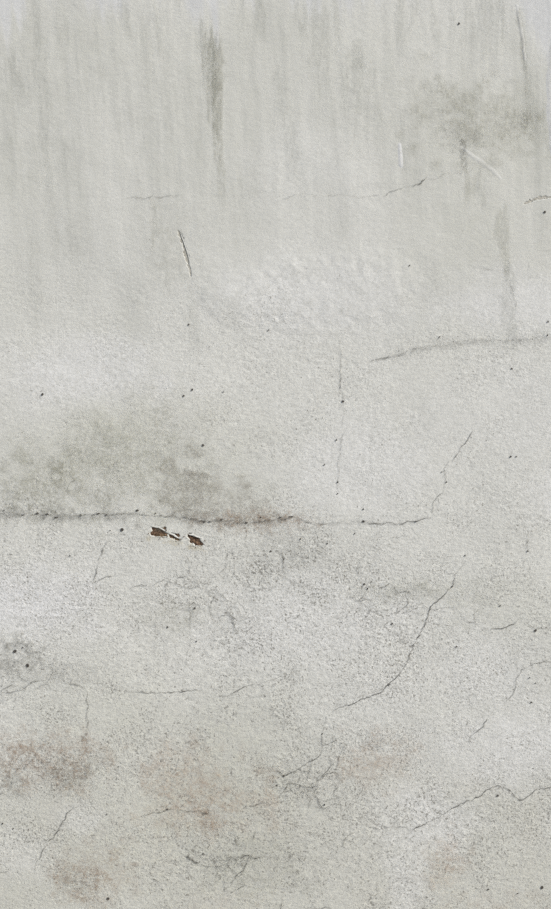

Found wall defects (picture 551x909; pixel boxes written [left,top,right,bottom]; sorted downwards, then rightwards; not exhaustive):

crack [348,581,454,706]
crack [276,740,345,808]